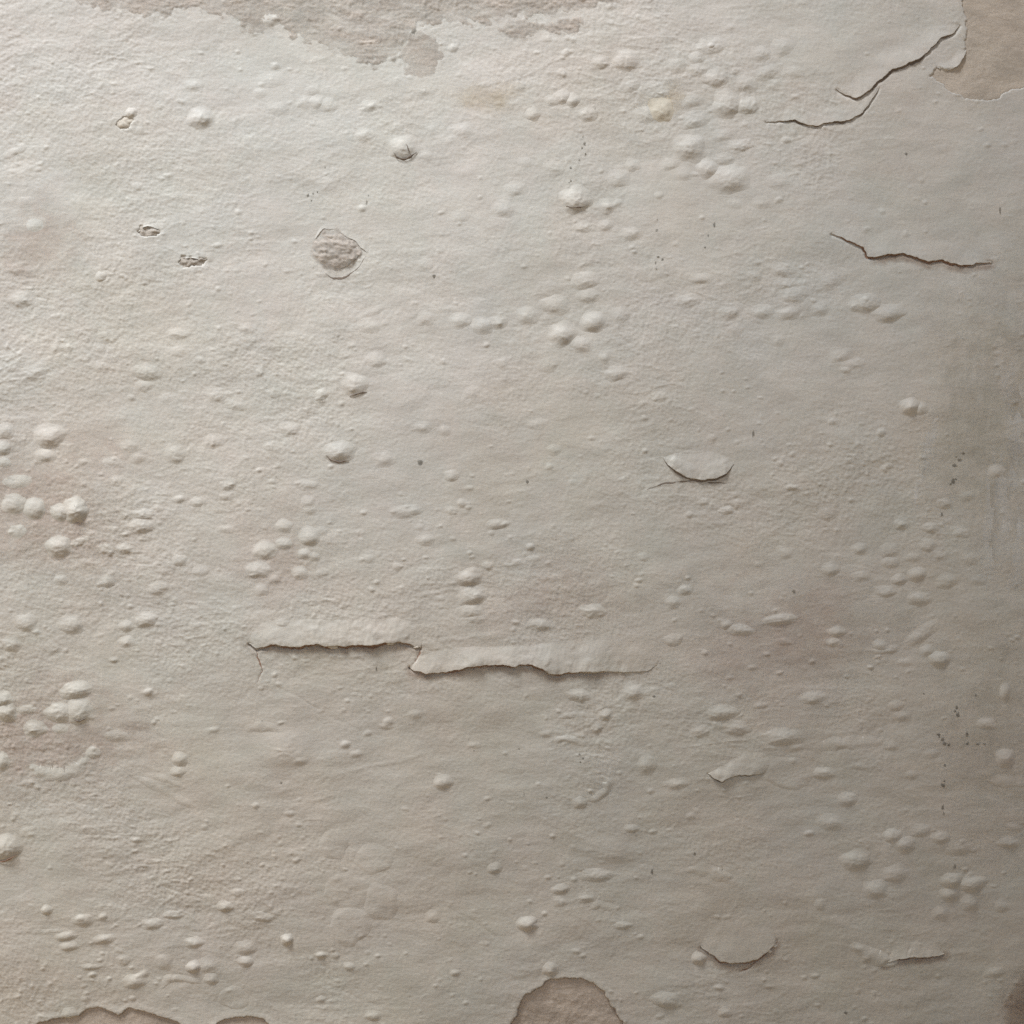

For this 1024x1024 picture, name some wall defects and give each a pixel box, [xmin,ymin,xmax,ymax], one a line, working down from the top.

peeling [218,0,444,76]
peeling [456,0,595,36]
peeling [930,0,1024,101]
crack [832,224,992,267]
peeling [38,1007,179,1024]
peeling [512,978,623,1024]